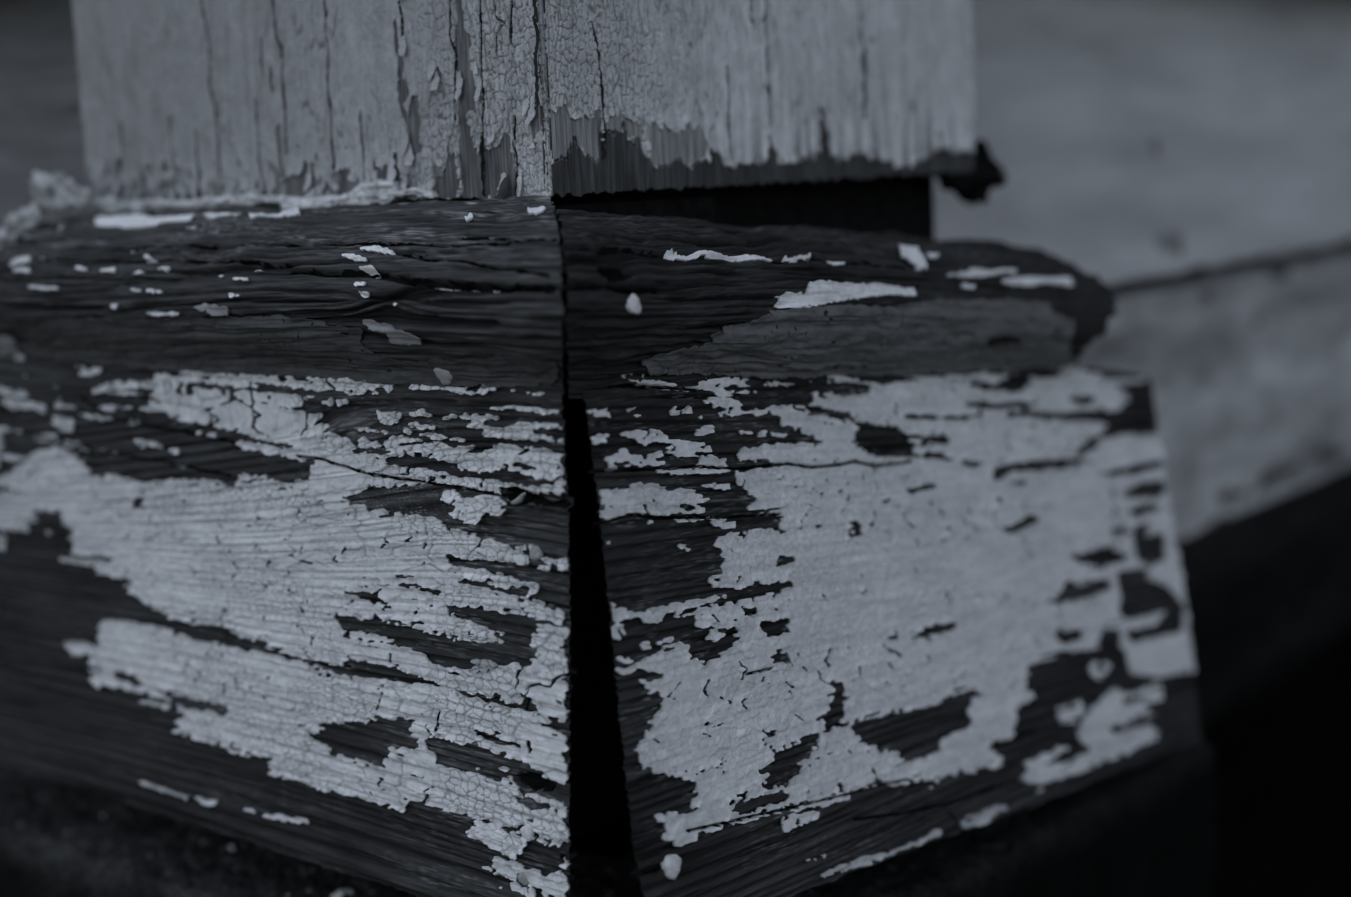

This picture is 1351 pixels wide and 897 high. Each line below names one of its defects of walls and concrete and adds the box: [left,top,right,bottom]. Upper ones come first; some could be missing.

crack [397,0,405,36]
crack [324,0,365,180]
crack [449,0,540,197]
peeling [87,0,975,231]
crack [591,24,607,163]
crack [0,236,673,296]
peeling [342,245,396,298]
peeling [781,253,811,263]
crack [609,384,696,392]
peeling [0,270,571,897]
peeling [587,268,1196,847]
peeling [806,829,942,878]